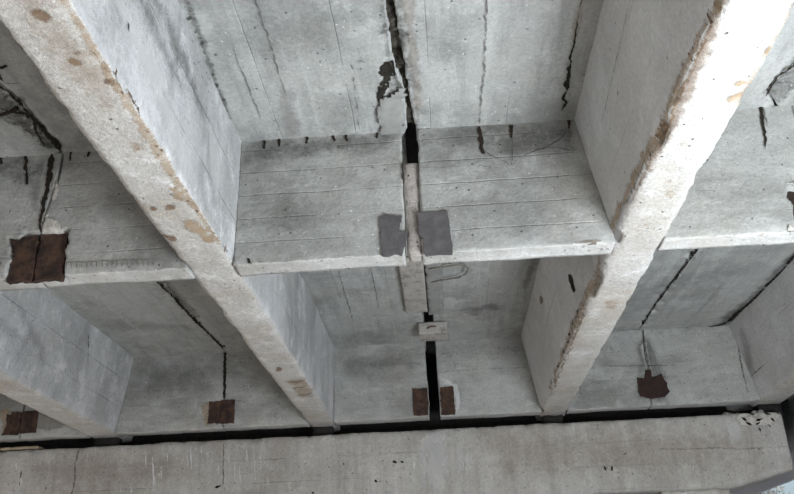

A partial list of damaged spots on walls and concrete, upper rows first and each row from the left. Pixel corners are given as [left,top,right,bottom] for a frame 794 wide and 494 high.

spalling [0,89,55,149]
crack [0,75,62,235]
crack [479,0,488,124]
crack [561,0,582,111]
crack [157,282,227,400]
crack [642,249,698,369]
crack [710,256,794,327]
spalling [734,412,780,431]